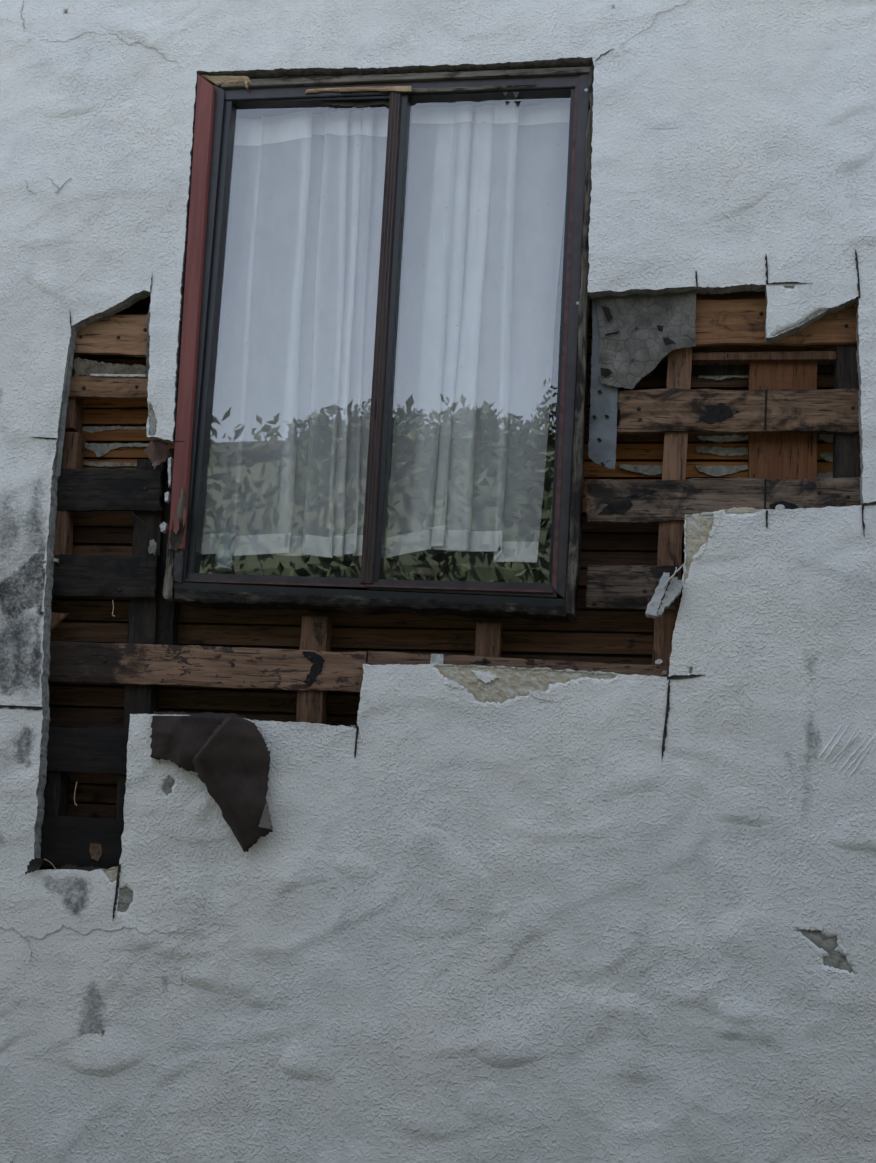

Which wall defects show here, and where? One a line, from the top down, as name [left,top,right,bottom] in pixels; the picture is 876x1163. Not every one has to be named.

crack [595,0,689,61]
flaking render [148,404,157,436]
flaking render [684,507,759,584]
flaking render [435,665,616,704]
flaking render [162,776,175,796]
flaking render [794,926,856,974]